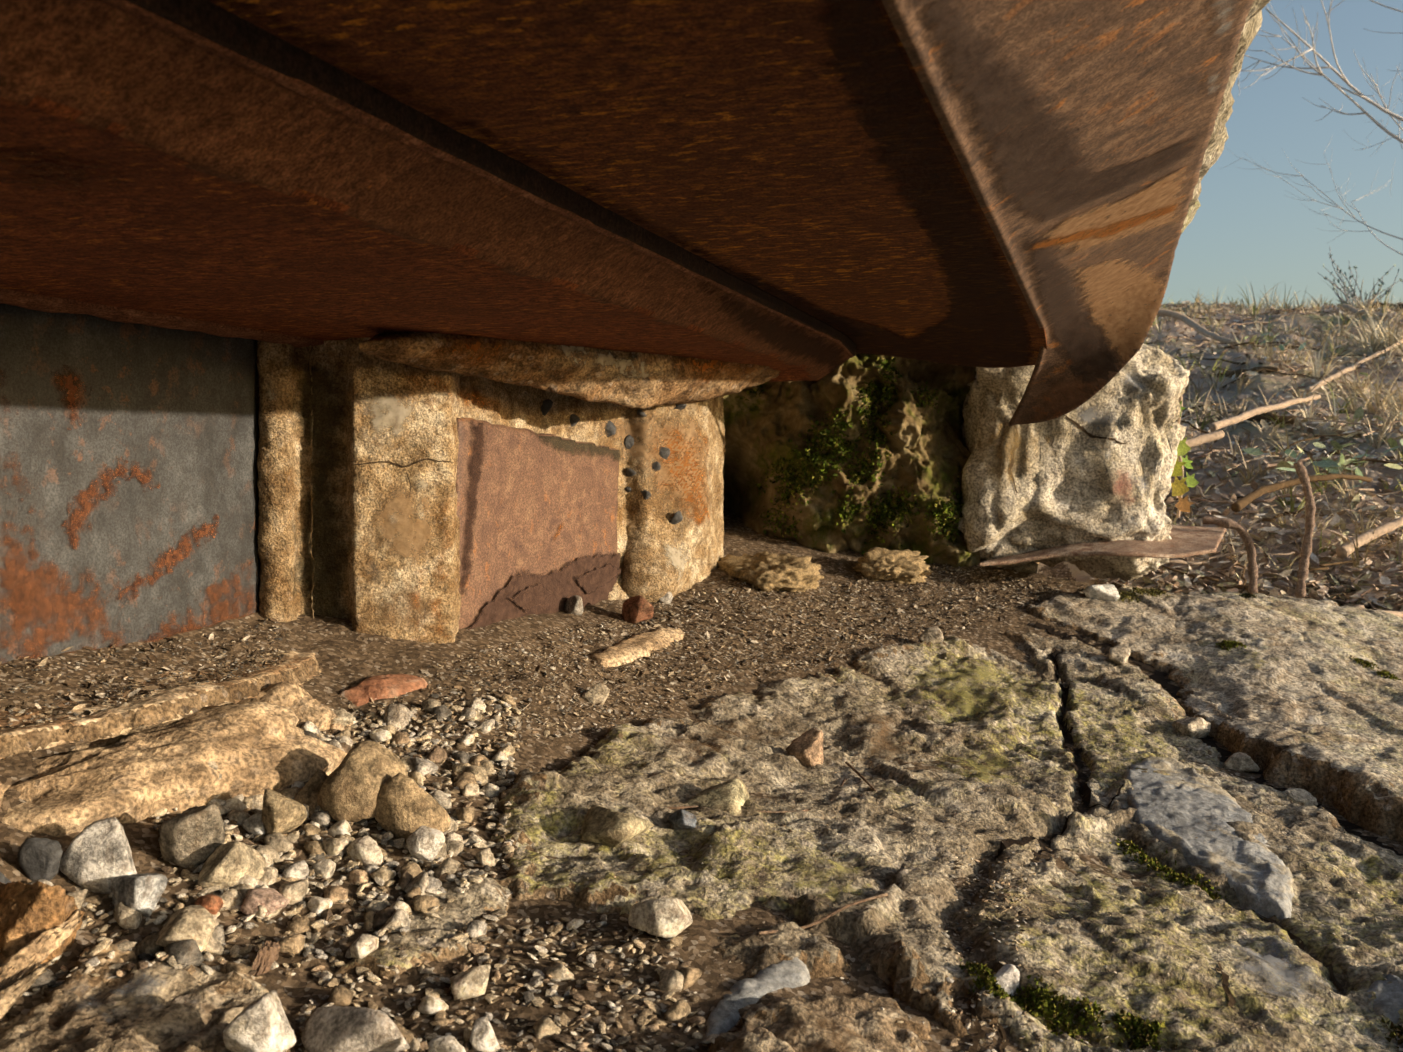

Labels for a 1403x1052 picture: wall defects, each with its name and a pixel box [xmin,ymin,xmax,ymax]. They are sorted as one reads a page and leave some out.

corrosion [1033,169,1187,367]
corrosion [1035,380,1105,419]
corrosion [63,461,160,549]
corrosion [120,515,220,600]